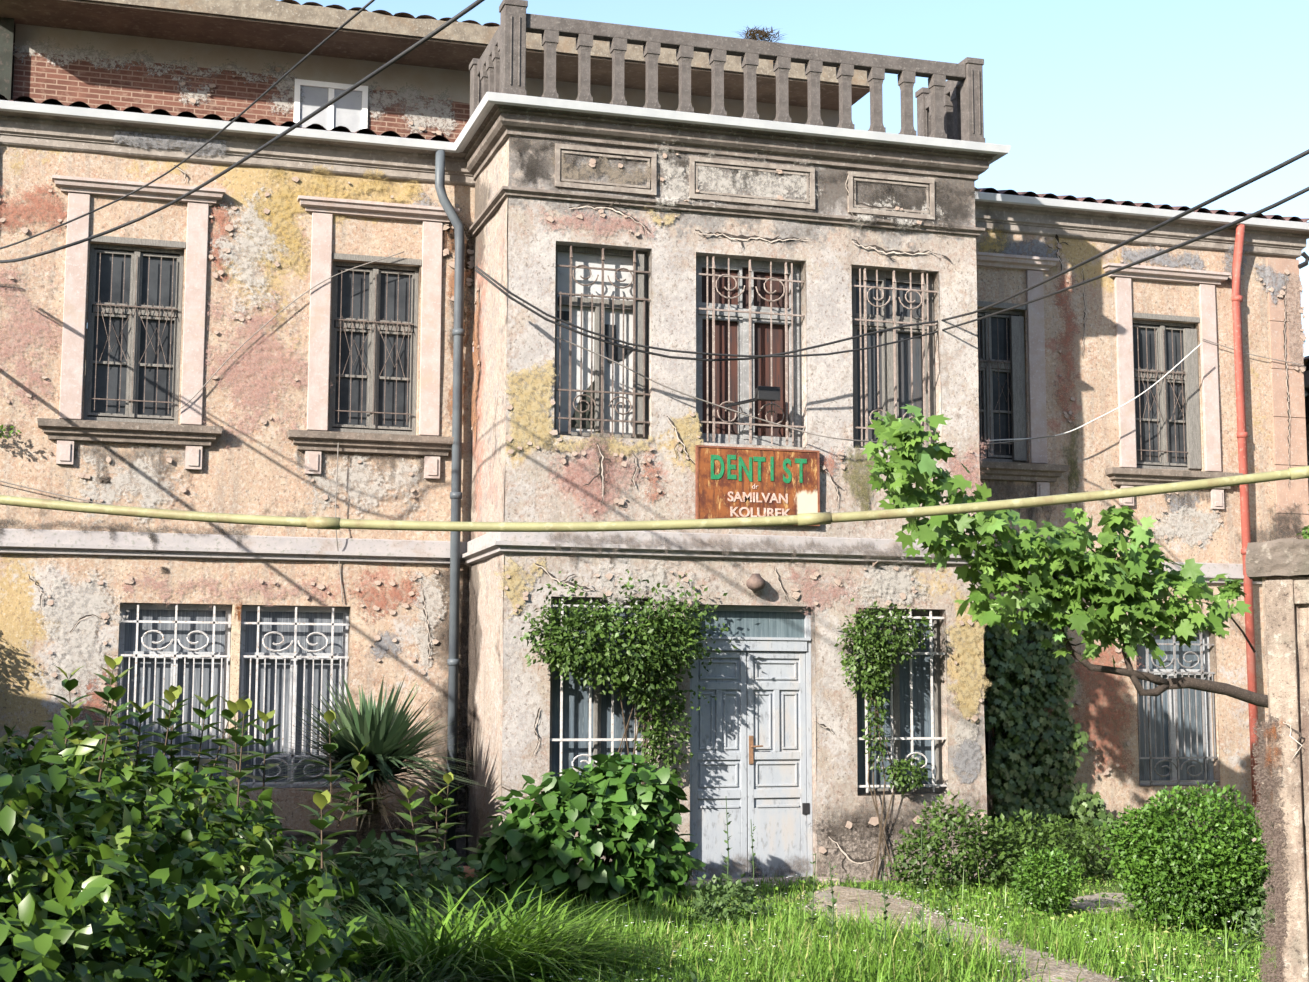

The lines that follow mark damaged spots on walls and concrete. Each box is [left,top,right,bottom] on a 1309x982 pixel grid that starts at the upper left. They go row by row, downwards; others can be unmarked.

flaking render [13,39,304,115]
flaking render [0,180,68,432]
flaking render [204,165,480,520]
peeling [505,360,666,522]
spalling [1151,491,1223,548]
spalling [29,555,448,739]